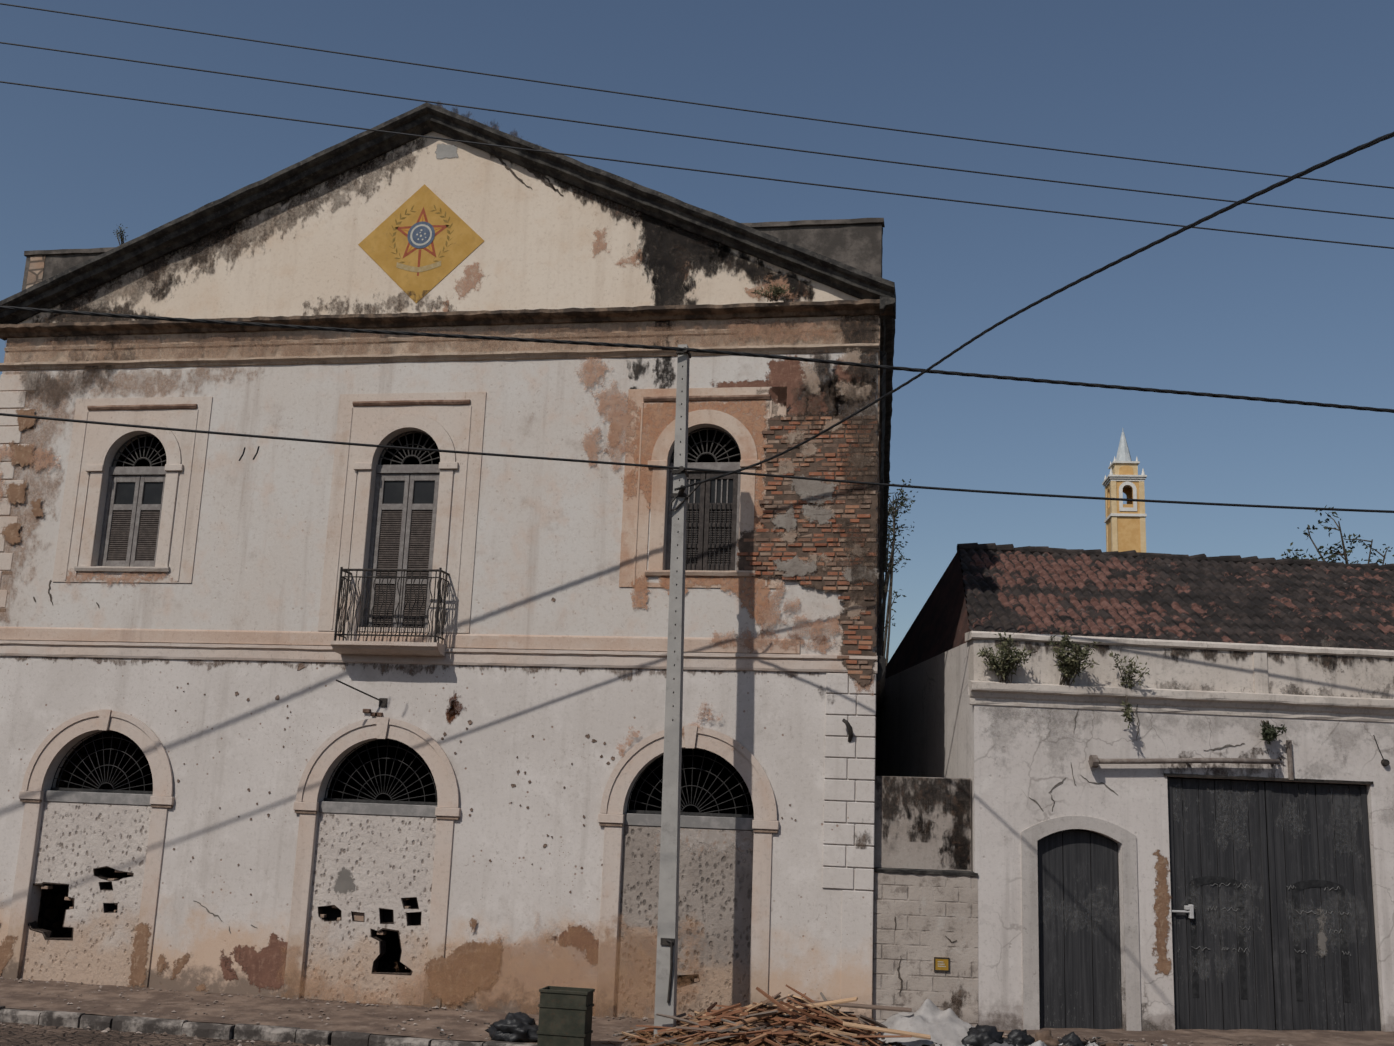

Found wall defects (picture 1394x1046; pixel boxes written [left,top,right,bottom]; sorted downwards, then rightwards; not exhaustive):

water stain [0,139,425,621]
water stain [352,399,470,407]
water stain [409,153,879,502]
flaking render [577,319,879,695]
water stain [1267,635,1394,699]
water stain [855,713,971,870]
crack [1029,764,1118,811]
crack [1204,743,1245,751]
spalling [93,866,134,913]
spalling [219,933,288,992]
spalling [318,897,502,1005]
spalling [1151,849,1172,975]